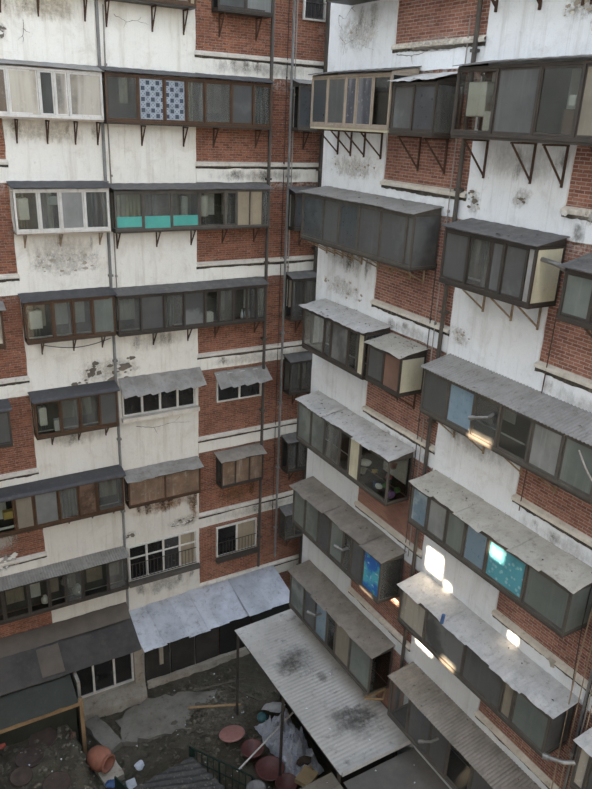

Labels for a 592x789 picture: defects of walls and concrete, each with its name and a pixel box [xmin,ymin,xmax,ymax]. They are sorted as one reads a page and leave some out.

peeling [71,356,136,386]